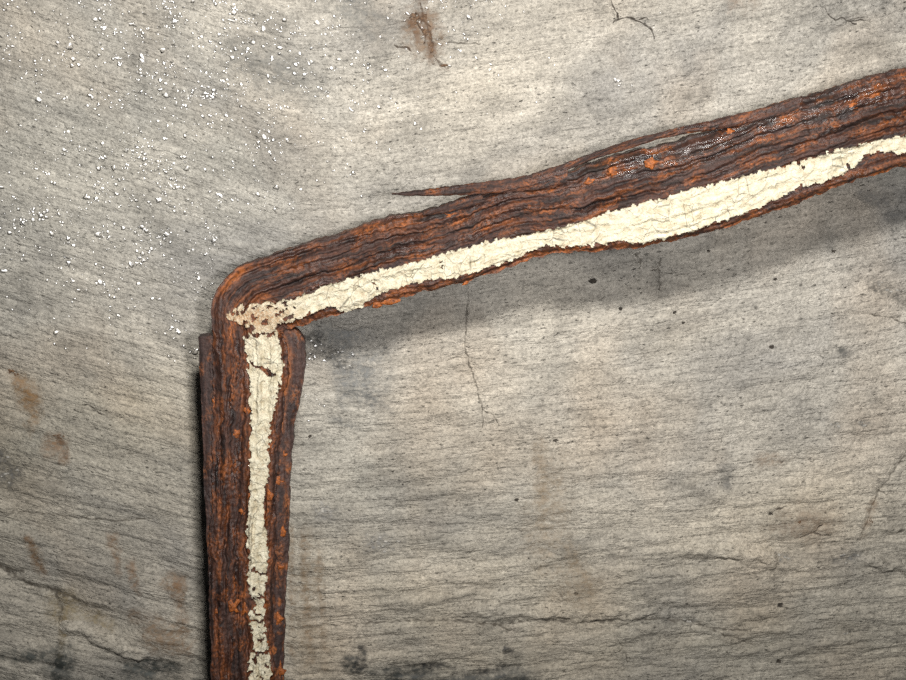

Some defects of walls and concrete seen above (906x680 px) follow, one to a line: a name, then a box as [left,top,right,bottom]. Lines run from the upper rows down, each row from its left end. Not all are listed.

rust [395,2,448,67]
rust [198,67,906,680]
crack [0,564,99,609]